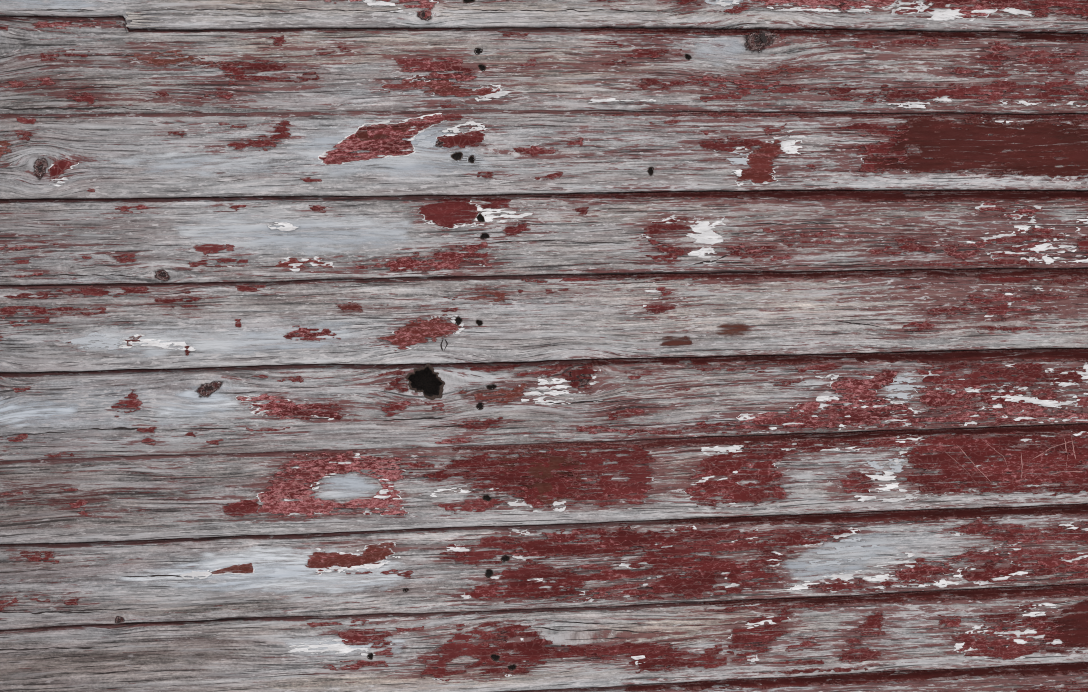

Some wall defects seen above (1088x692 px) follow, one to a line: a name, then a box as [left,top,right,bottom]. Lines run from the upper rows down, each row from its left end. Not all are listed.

peeling [40,49,90,63]
peeling [123,50,320,100]
peeling [318,56,511,165]
peeling [218,120,291,151]
peeling [378,0,1088,351]
peeling [267,222,298,231]
peeling [188,244,248,268]
peeling [274,256,334,272]
peeling [354,242,492,272]
peeling [336,301,363,313]
peeling [283,325,341,341]
peeling [222,349,1088,692]